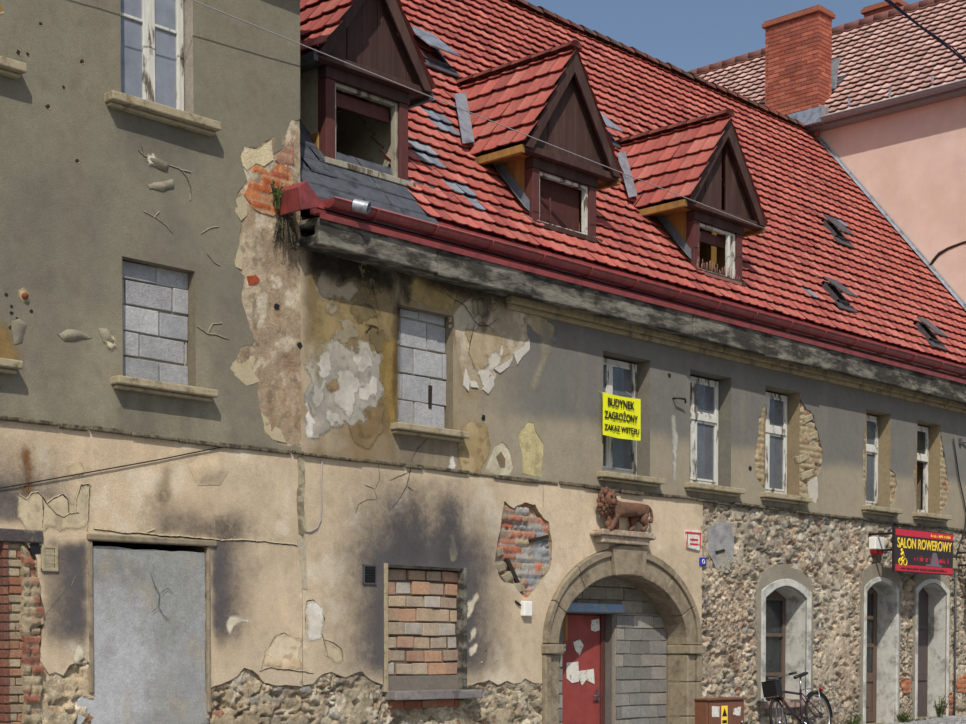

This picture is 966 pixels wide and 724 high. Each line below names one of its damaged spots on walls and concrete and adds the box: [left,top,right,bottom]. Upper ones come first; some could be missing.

flaking render [230,119,385,590]
peeling [408,277,554,394]
crack [355,438,428,513]
flaking render [749,407,765,487]
flaking render [795,403,823,504]
crack [150,571,173,619]
peeling [264,602,342,669]
flaking render [495,502,551,597]